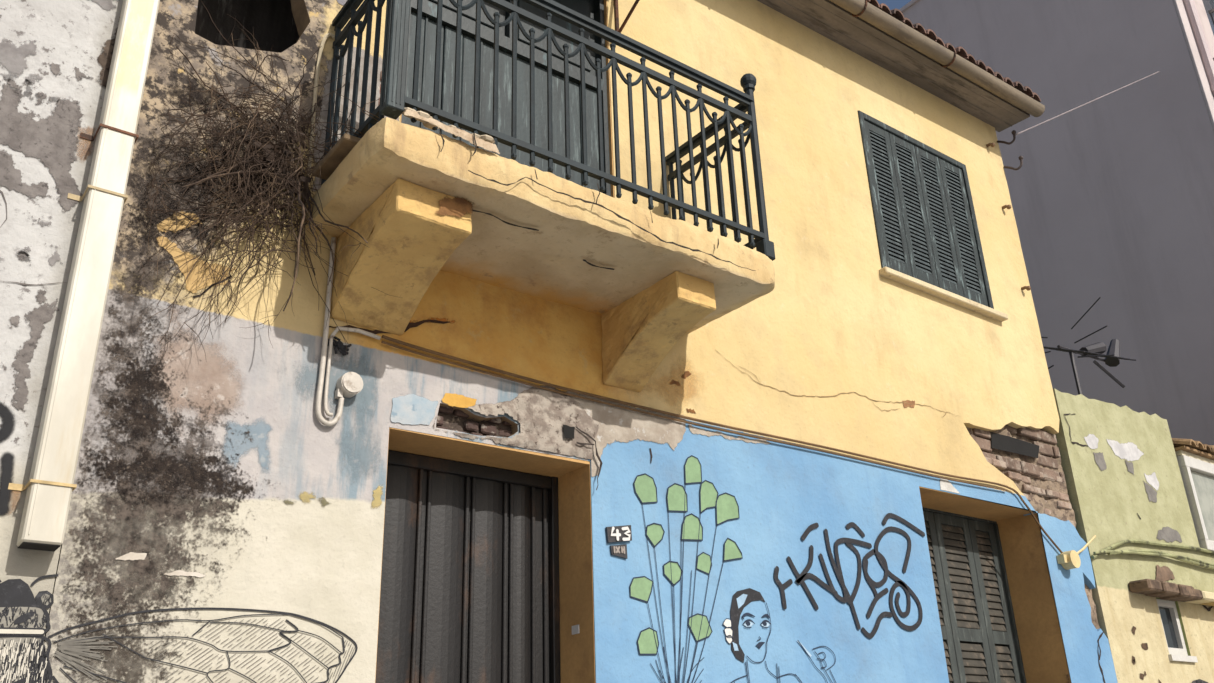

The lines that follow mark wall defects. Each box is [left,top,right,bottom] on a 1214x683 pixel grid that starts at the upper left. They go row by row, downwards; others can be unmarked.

peeling [92,0,119,10]
peeling [0,38,92,227]
water stain [167,75,231,129]
crack [468,133,755,271]
peeling [45,243,63,266]
peeling [1,287,59,413]
water stain [51,126,270,683]
peeling [298,358,377,473]
spalling [391,385,771,477]
crack [717,351,959,417]
spalling [966,425,1076,528]
peeling [1084,434,1159,503]